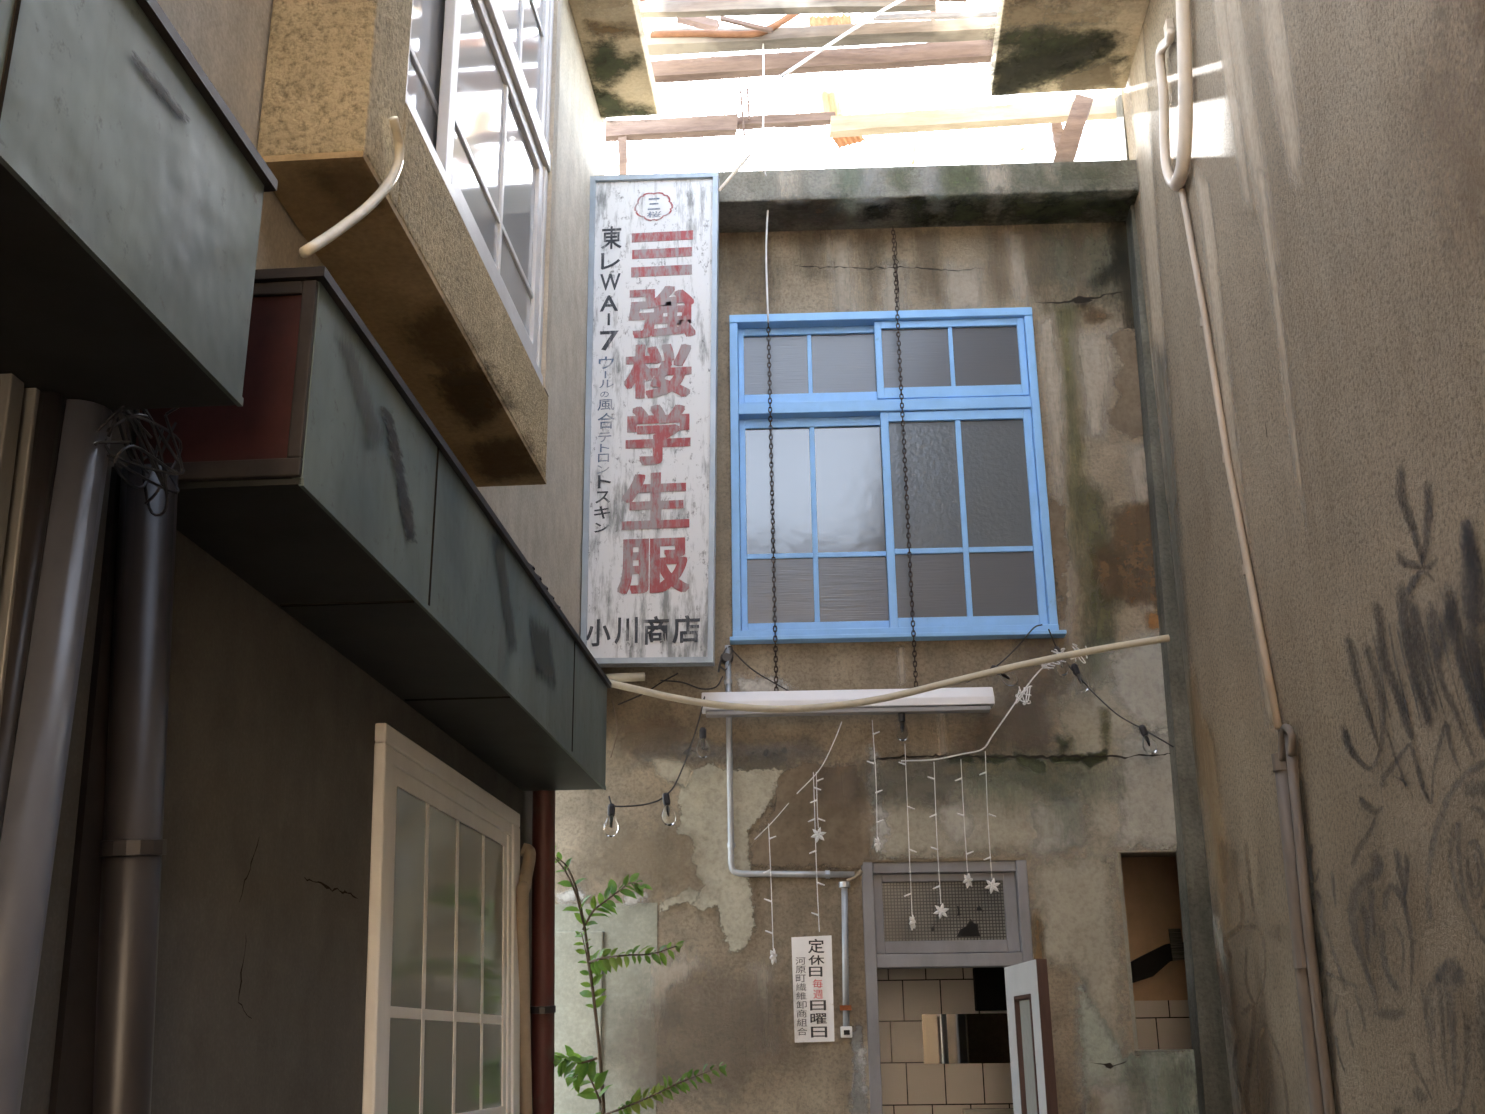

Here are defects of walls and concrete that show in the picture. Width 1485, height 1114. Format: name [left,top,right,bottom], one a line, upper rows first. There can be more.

damp [585,0,661,122]
damp [773,173,856,312]
damp [1214,0,1305,511]
damp [1195,171,1251,560]
damp [861,0,1241,1114]
peeling [557,891,583,901]
peeling [625,759,784,953]